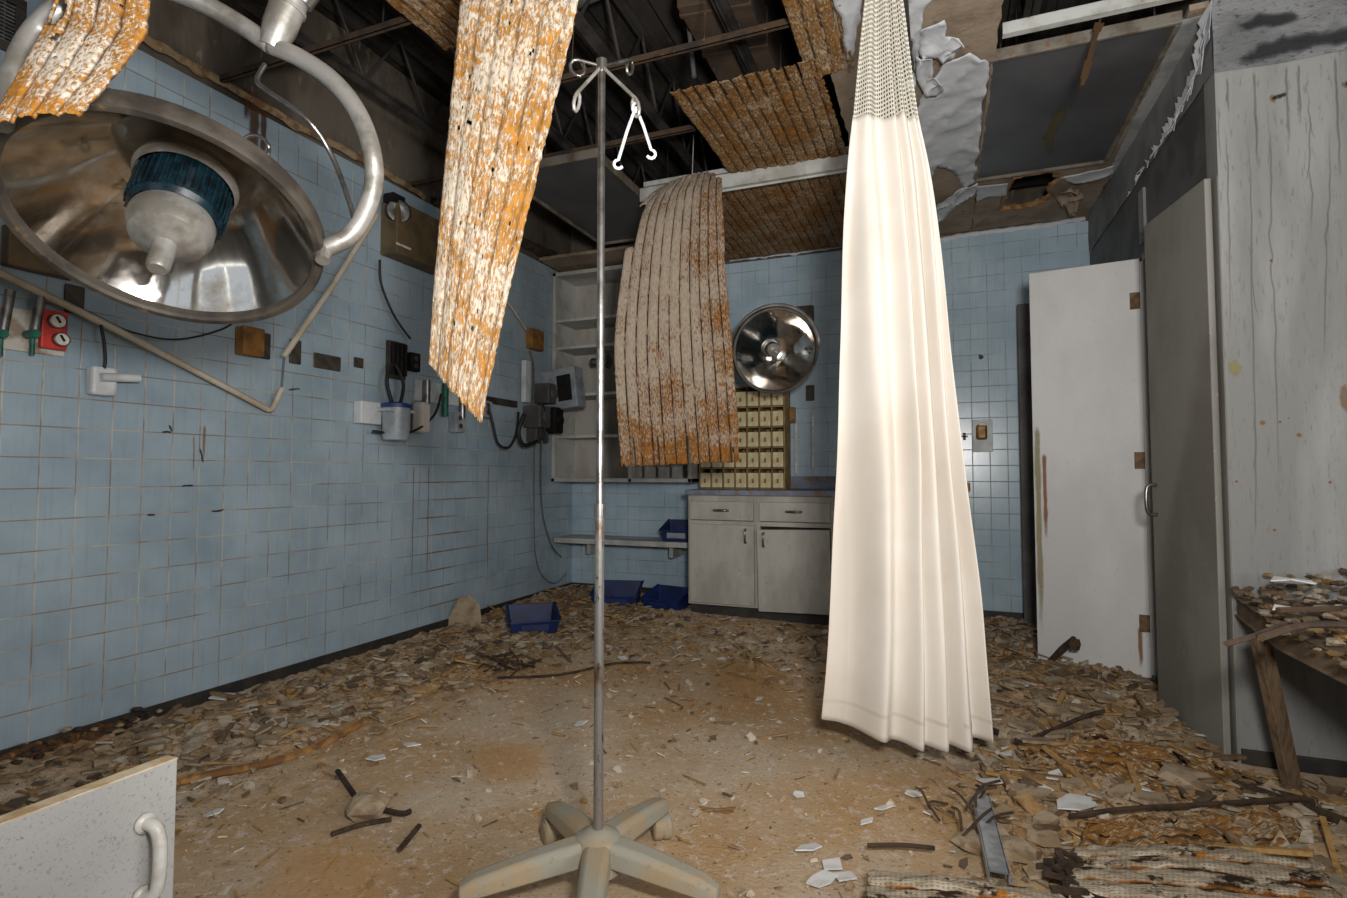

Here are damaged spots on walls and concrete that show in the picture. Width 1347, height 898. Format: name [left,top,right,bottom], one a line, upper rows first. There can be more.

peeling [833,0,862,61]
peeling [908,0,1115,242]
flaking render [516,237,557,257]
flaking render [729,247,840,261]